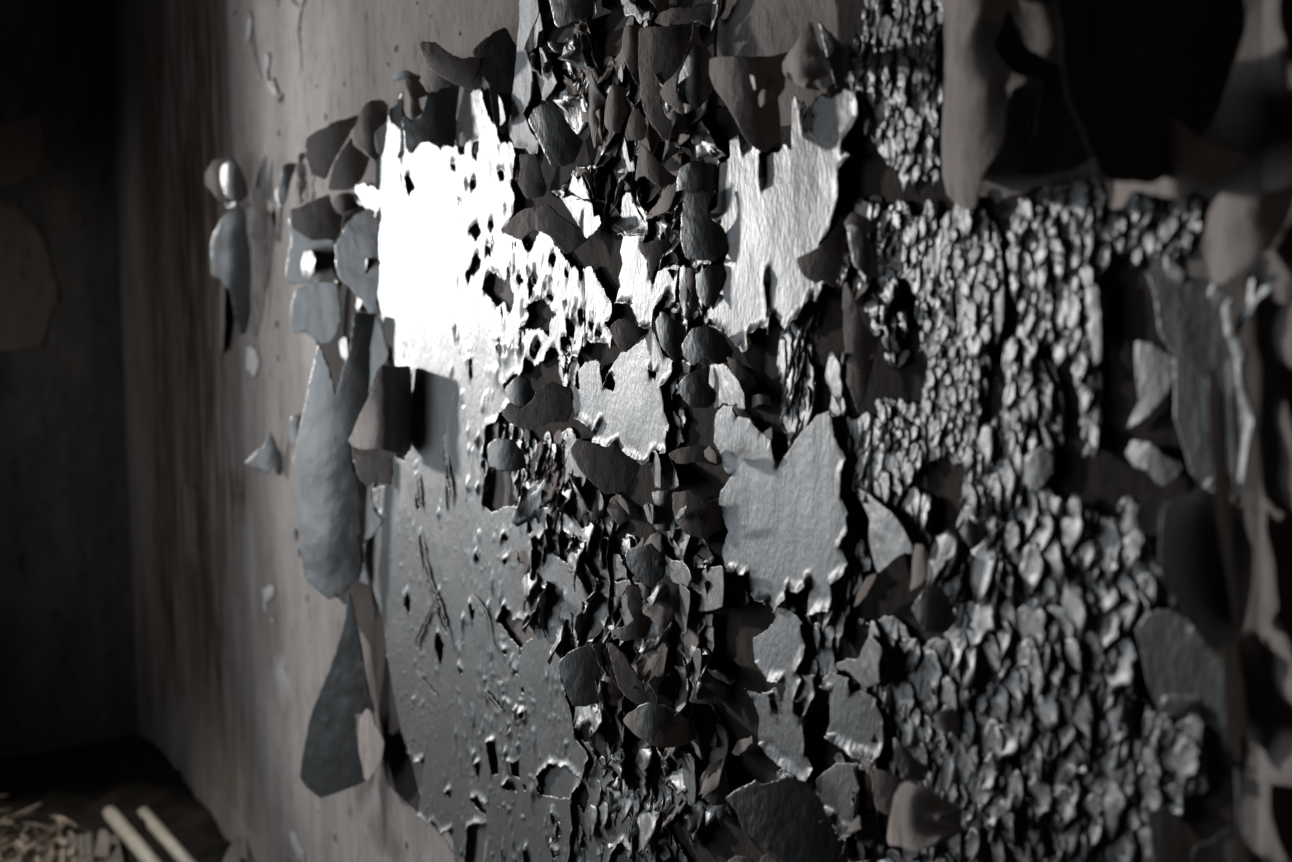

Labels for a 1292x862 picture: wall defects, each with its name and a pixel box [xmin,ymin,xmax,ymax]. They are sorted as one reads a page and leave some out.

peeling [205,157,275,354]
peeling [245,432,283,475]
peeling [275,0,1292,862]